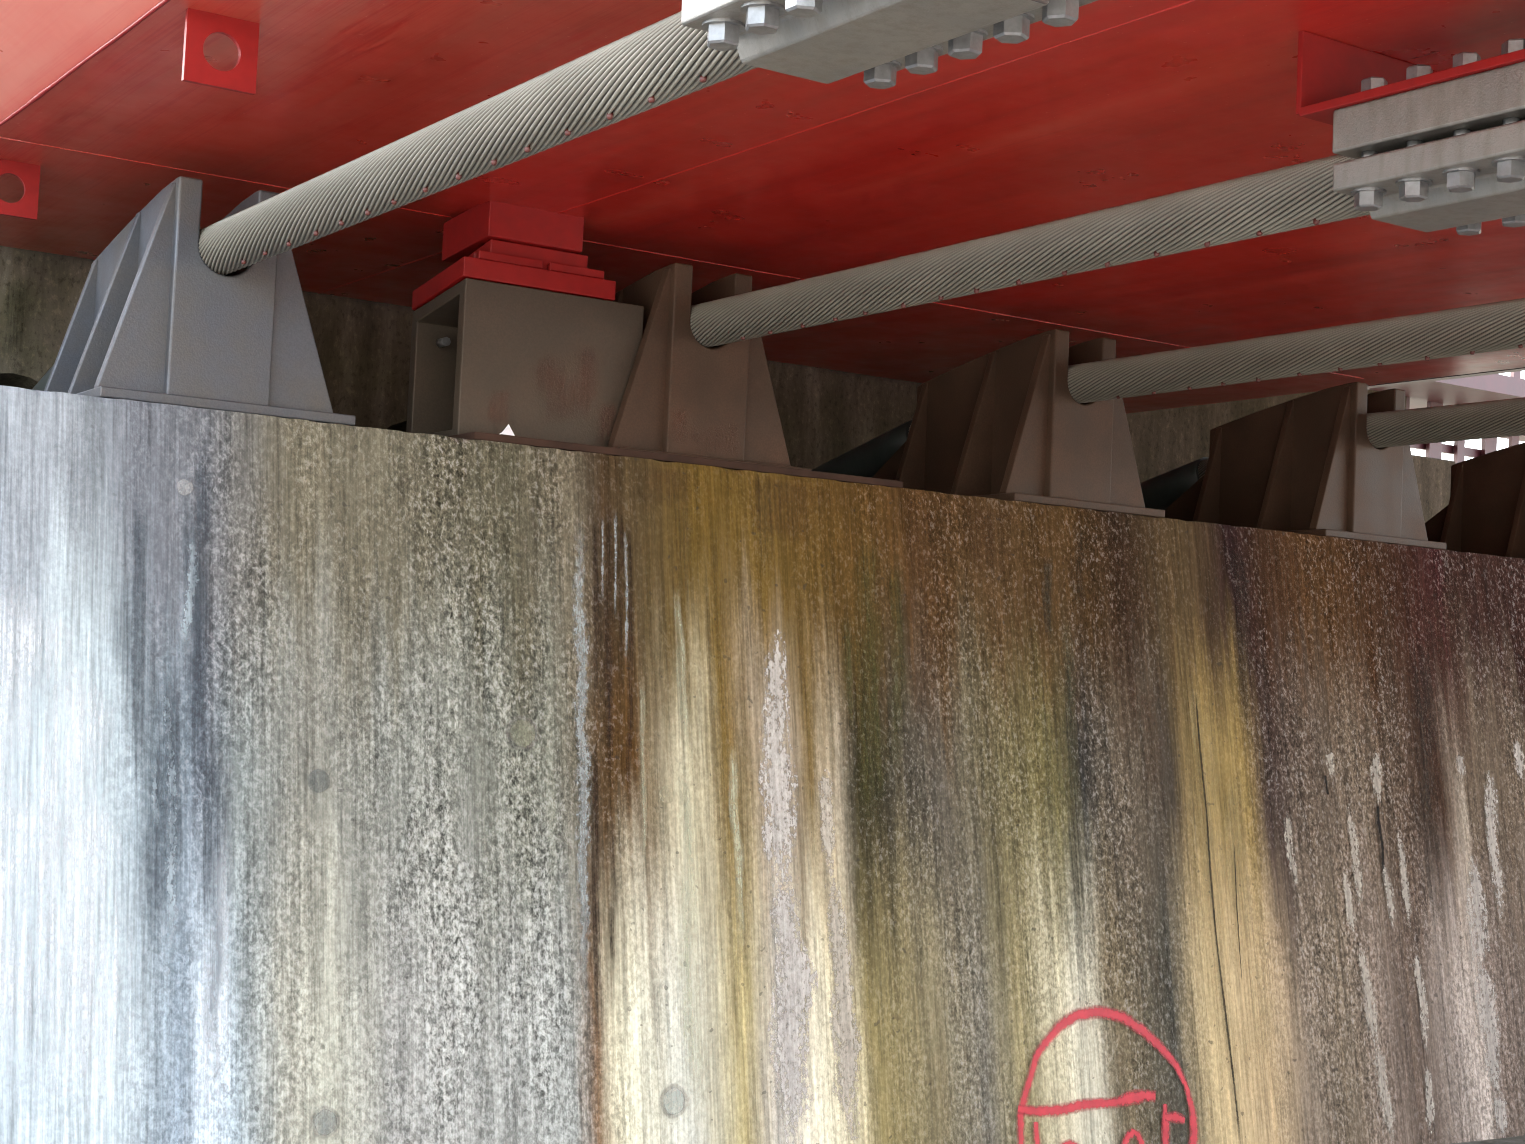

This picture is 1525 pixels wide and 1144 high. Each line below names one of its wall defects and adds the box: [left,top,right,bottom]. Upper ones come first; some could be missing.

damp [0,609,57,769]
damp [0,700,118,1056]
damp [131,522,146,710]
damp [152,477,207,915]
damp [202,767,227,1070]
damp [729,764,742,895]
damp [1066,688,1083,924]
crack [1196,701,1242,1132]